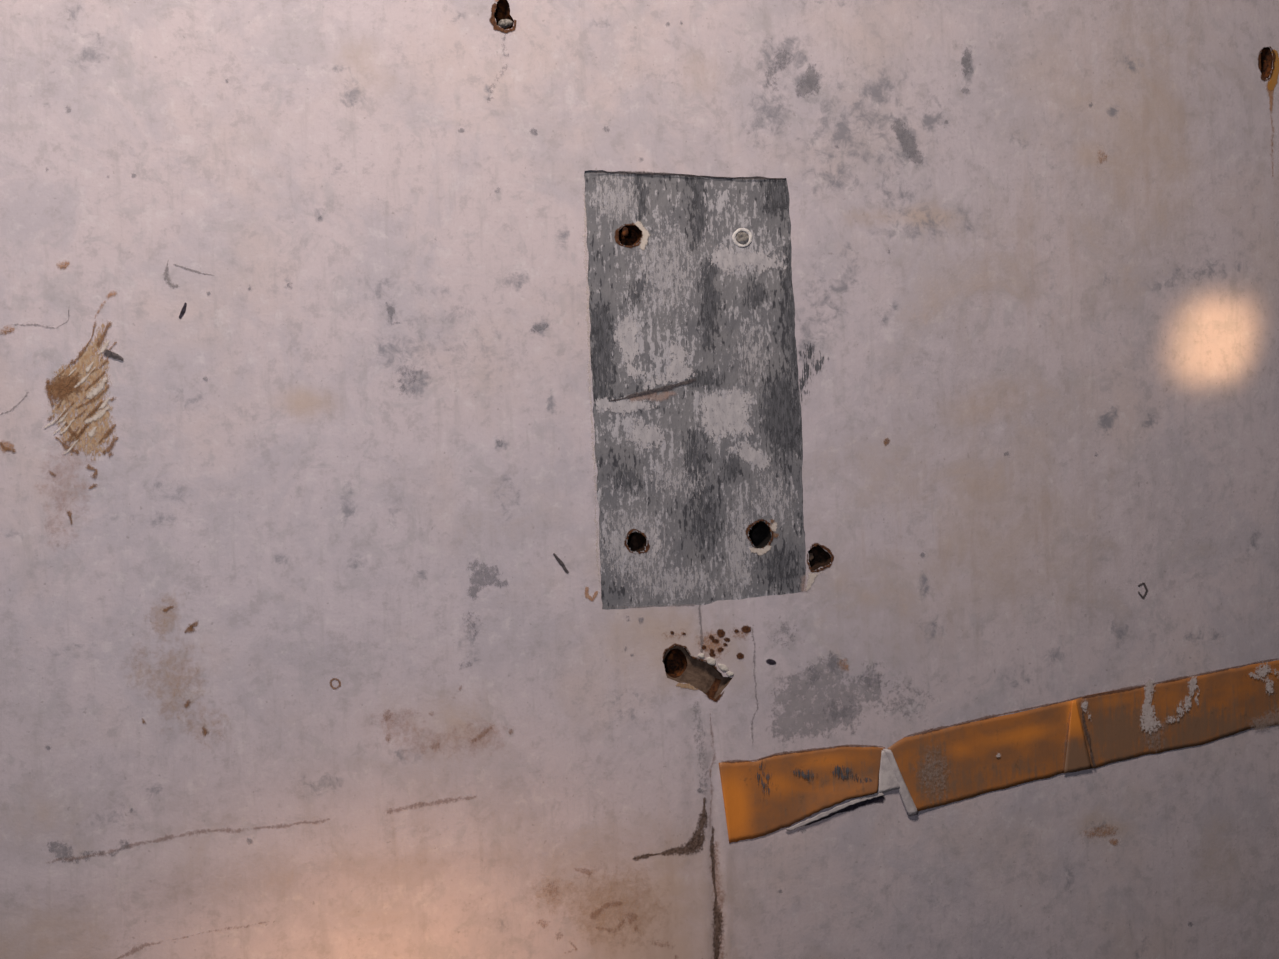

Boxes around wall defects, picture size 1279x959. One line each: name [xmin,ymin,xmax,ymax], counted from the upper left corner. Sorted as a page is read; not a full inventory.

rust [490,0,516,33]
rust [1258,47,1276,111]
crack [697,605,705,652]
crack [49,842,129,863]
crack [633,707,724,959]